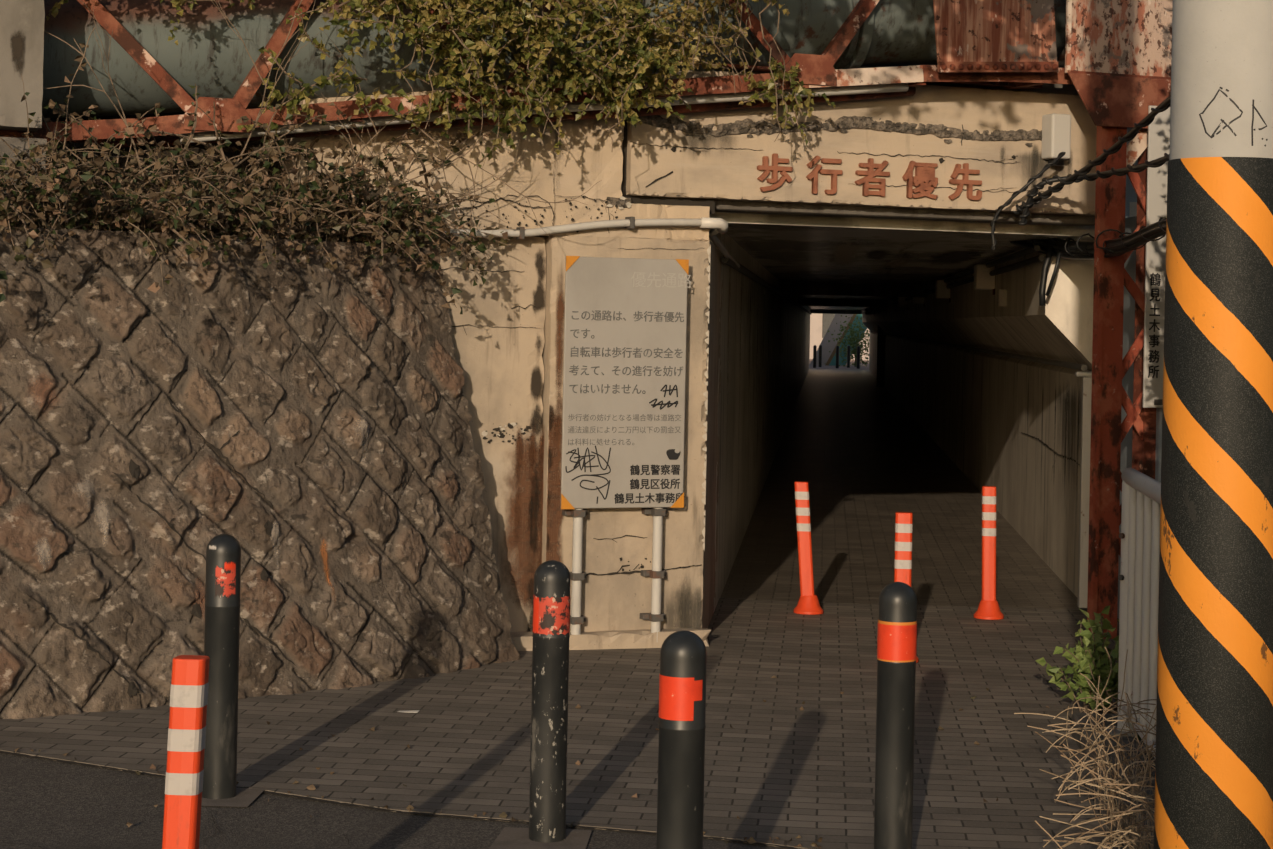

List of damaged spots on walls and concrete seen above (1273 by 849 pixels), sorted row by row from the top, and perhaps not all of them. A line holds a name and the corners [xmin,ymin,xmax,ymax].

rust [506,293,565,606]